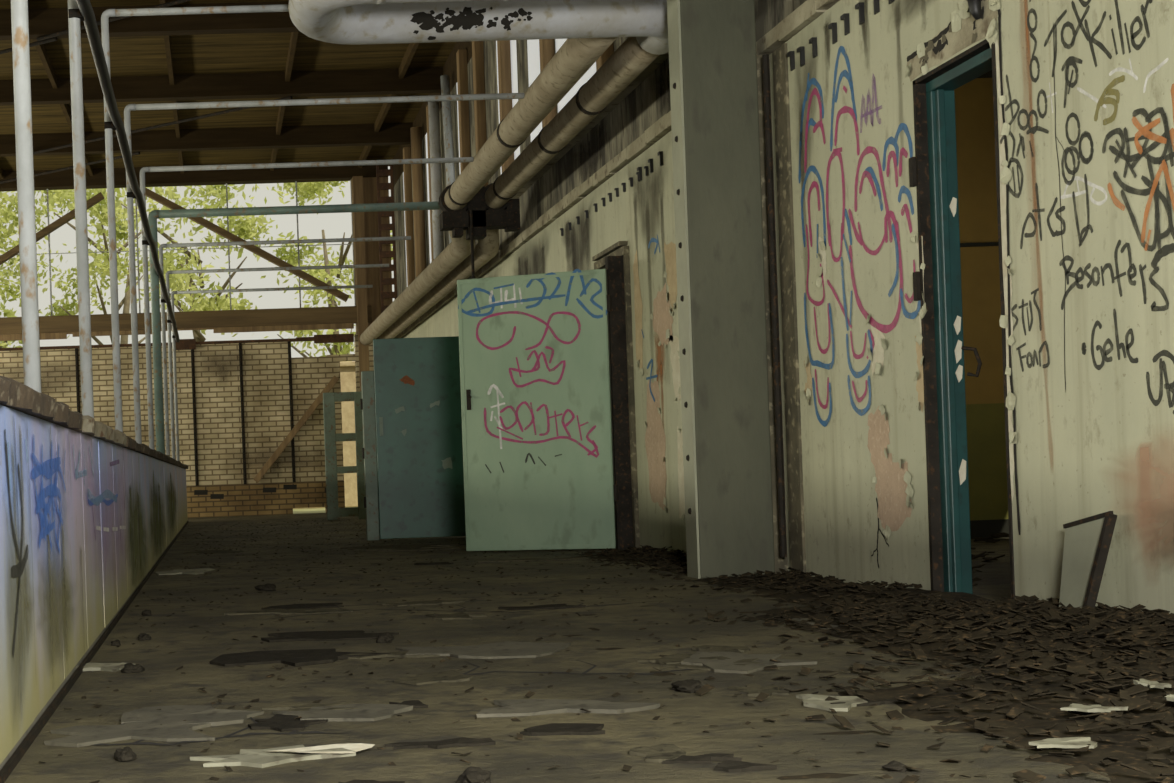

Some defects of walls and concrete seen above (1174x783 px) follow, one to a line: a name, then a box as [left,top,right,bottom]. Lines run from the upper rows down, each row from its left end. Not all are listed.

peeling [410,7,533,40]
peeling [867,404,914,539]